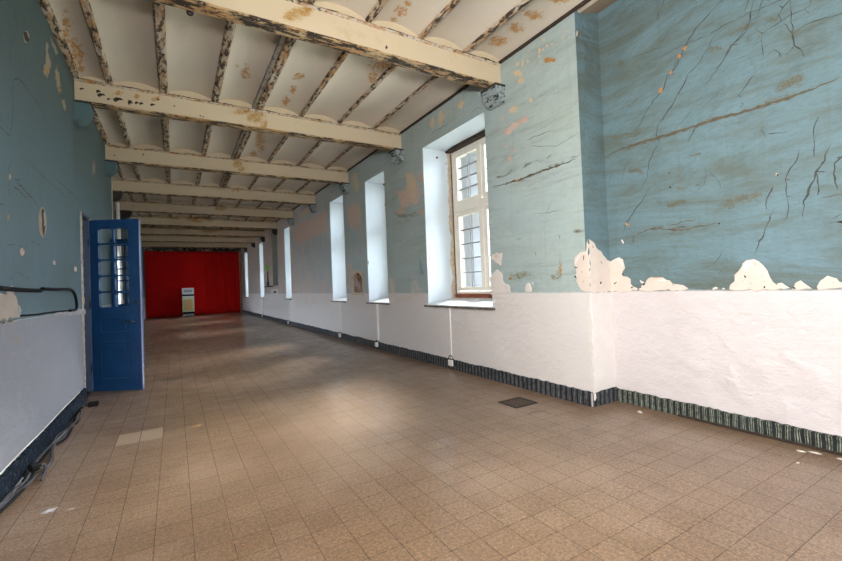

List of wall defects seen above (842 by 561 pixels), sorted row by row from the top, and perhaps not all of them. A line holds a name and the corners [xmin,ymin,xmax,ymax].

peeling [96,90,160,106]
crack [609,0,842,250]
peeling [490,253,511,295]
peeling [574,240,688,293]
peeling [713,259,842,292]
spalling [0,285,21,325]